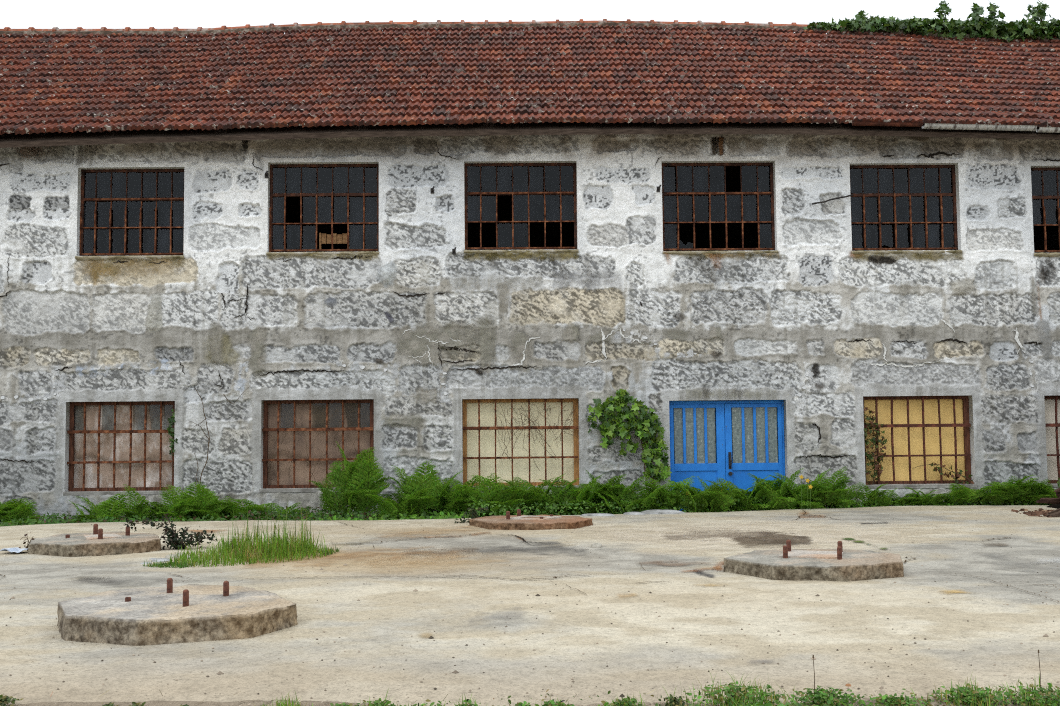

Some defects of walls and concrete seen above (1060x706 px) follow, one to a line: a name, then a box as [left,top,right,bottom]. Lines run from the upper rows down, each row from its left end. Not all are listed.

damp [705,532,810,546]